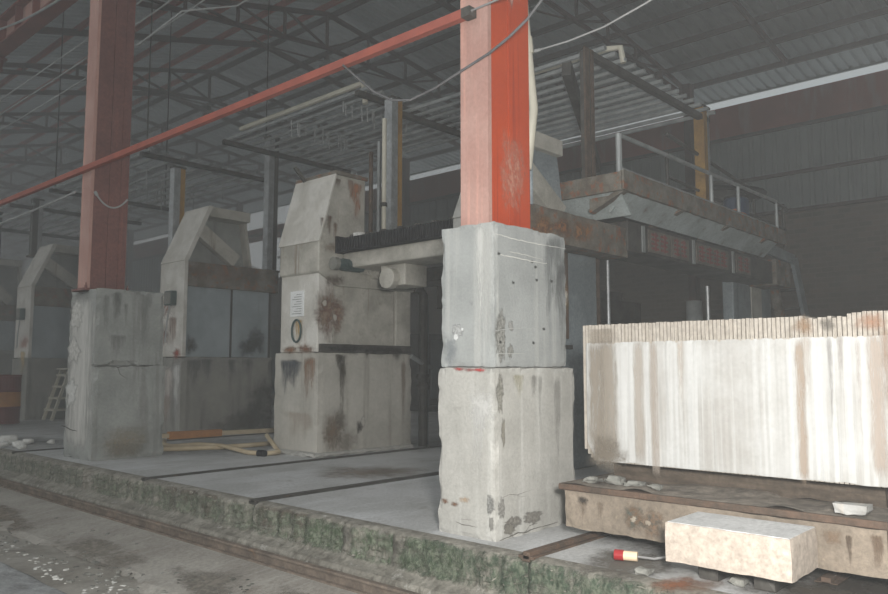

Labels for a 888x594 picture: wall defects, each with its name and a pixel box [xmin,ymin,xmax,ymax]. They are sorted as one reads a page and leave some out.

rust [316,294,345,334]
damp [282,360,300,383]
rust [285,345,315,393]
damp [336,354,346,393]
spalling [487,495,542,534]